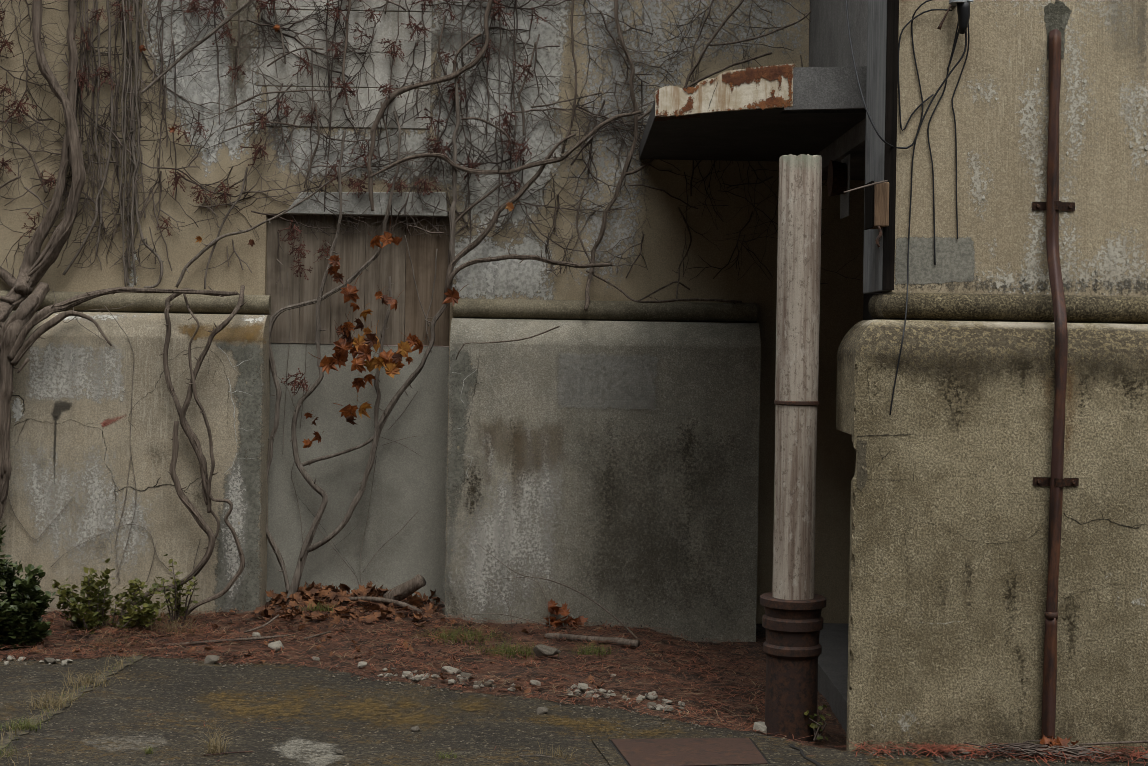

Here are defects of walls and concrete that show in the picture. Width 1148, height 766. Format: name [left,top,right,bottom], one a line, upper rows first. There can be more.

rust [656,64,795,118]
leakage [902,275,1047,293]
leakage [1063,271,1148,295]
leakage [870,349,1048,426]
crack [14,419,199,525]
leakage [449,426,562,615]
crack [904,502,1148,560]